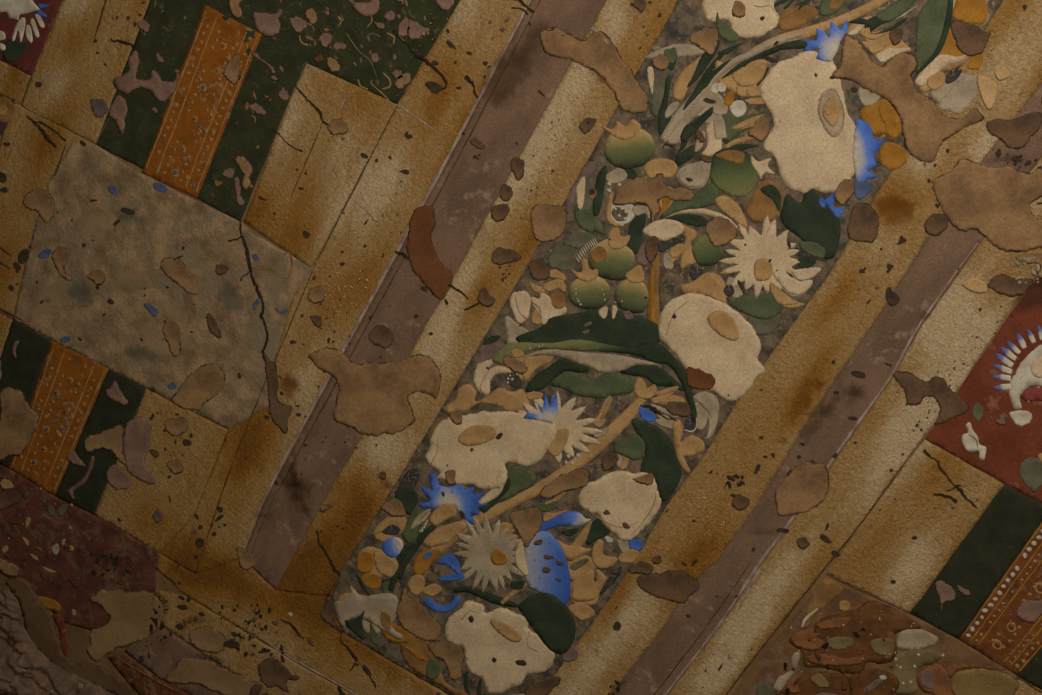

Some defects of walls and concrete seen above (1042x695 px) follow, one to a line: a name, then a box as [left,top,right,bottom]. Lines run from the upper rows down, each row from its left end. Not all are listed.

spalling [529,22,648,113]
spalling [950,20,991,56]
crack [228,220,269,359]
spalling [391,205,453,305]
spalling [263,353,307,433]
spalling [290,244,441,446]
spalling [885,335,982,440]
crack [923,449,977,509]
spalling [0,589,116,695]
spalling [86,551,205,671]
crack [316,530,340,610]
crack [337,631,376,695]